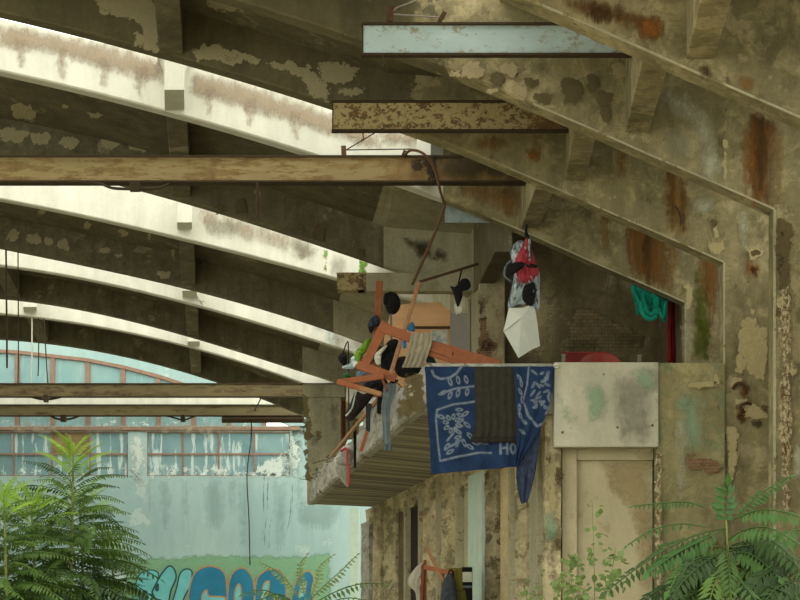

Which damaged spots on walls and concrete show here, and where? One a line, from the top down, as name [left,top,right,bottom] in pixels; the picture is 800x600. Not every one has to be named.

peeling [95,0,159,53]
rust [568,1,663,37]
water stain [0,27,163,89]
peeling [191,43,365,103]
water stain [193,75,332,135]
water stain [385,133,417,142]
rust [743,113,780,204]
rust [627,228,675,287]
water stain [683,275,709,358]
spalling [684,309,768,480]
spalling [776,218,800,512]
peeling [128,394,322,488]